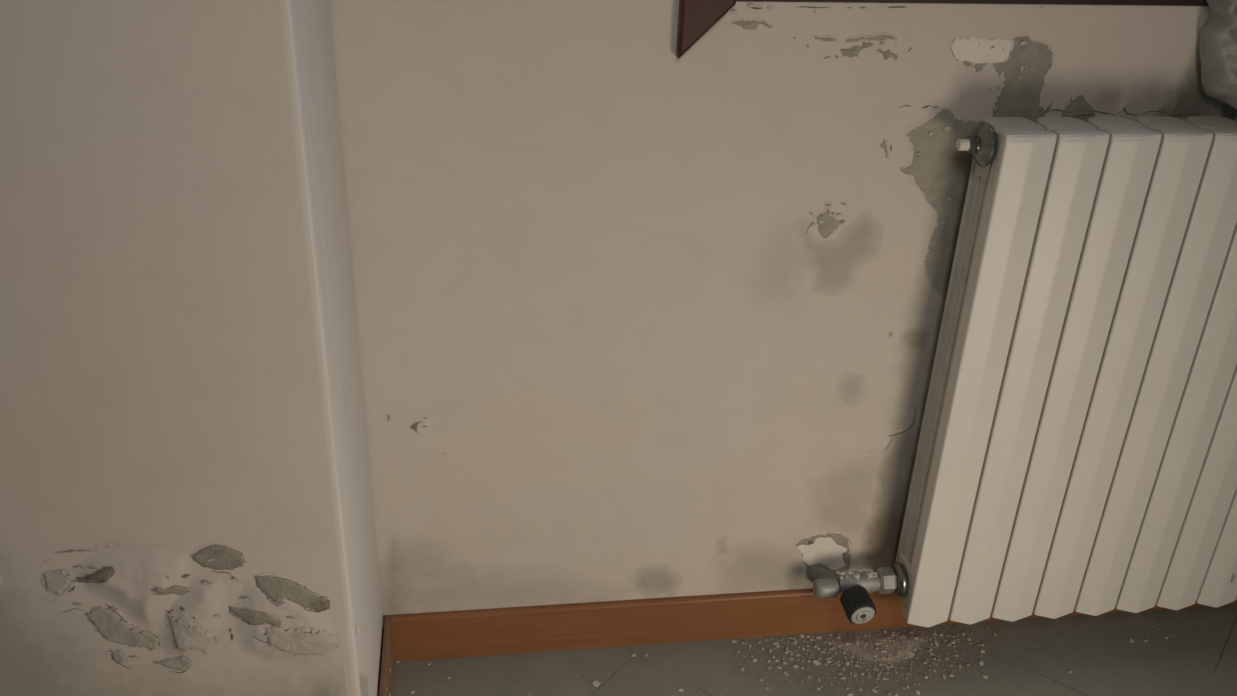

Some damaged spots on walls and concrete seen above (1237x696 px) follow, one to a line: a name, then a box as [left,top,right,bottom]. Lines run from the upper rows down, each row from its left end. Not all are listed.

peeling [729,17,772,30]
peeling [793,32,912,60]
flaking render [1061,93,1096,121]
flaking render [880,33,1055,299]
spalling [793,531,854,574]